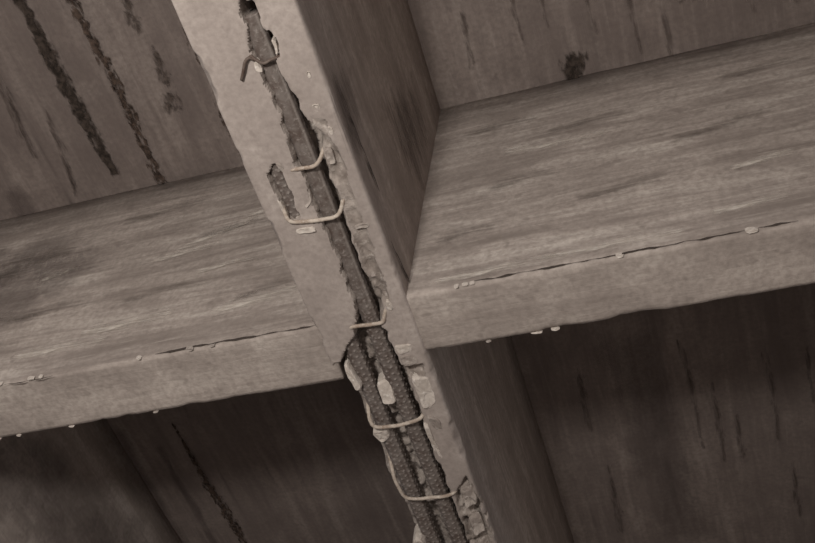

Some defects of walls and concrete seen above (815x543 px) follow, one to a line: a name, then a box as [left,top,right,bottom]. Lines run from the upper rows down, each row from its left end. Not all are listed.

water stain [13,0,118,175]
water stain [65,0,167,184]
mould [562,52,587,80]
spalling [238,0,495,543]
water stain [172,424,247,543]